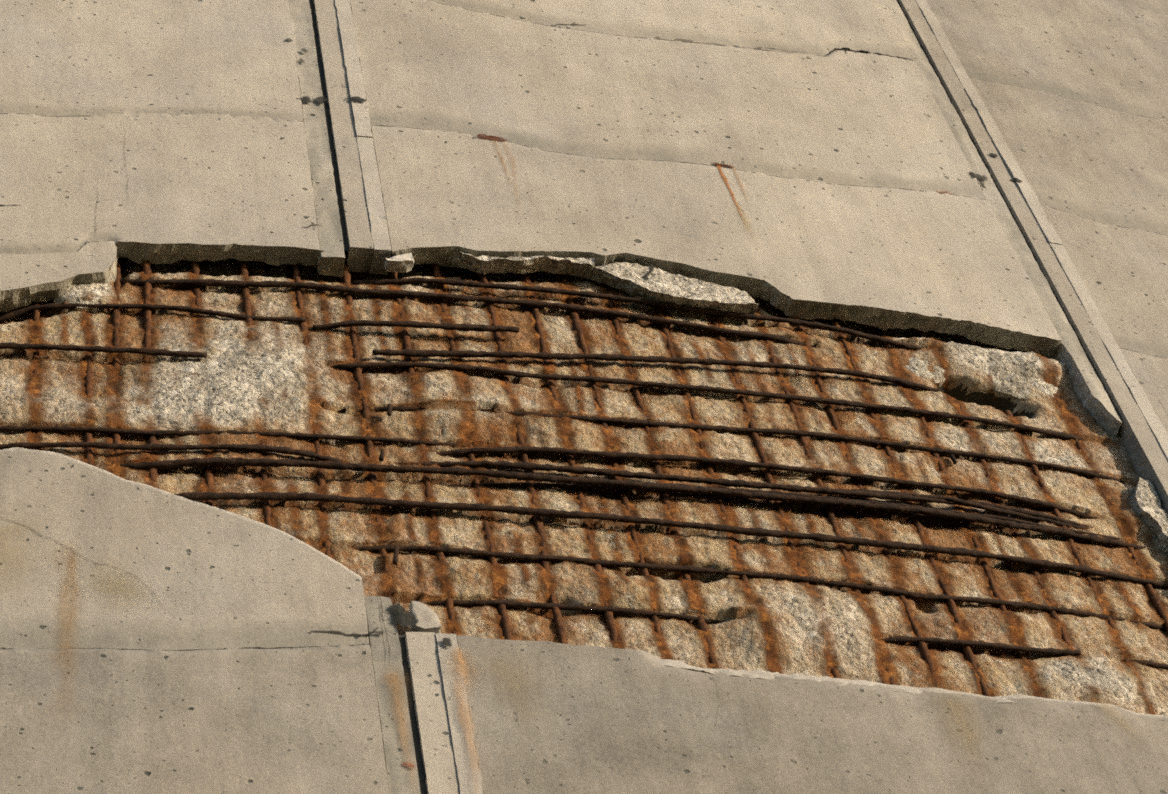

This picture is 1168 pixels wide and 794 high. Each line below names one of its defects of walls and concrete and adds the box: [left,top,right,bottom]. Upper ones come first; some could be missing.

rust [712,163,742,216]
rust [2,302,45,450]
rust [81,257,173,488]
rust [138,261,204,383]
rust [197,421,217,507]
rust [235,260,259,341]
rust [256,263,462,635]
spalling [0,250,1168,718]
rust [427,264,1168,715]